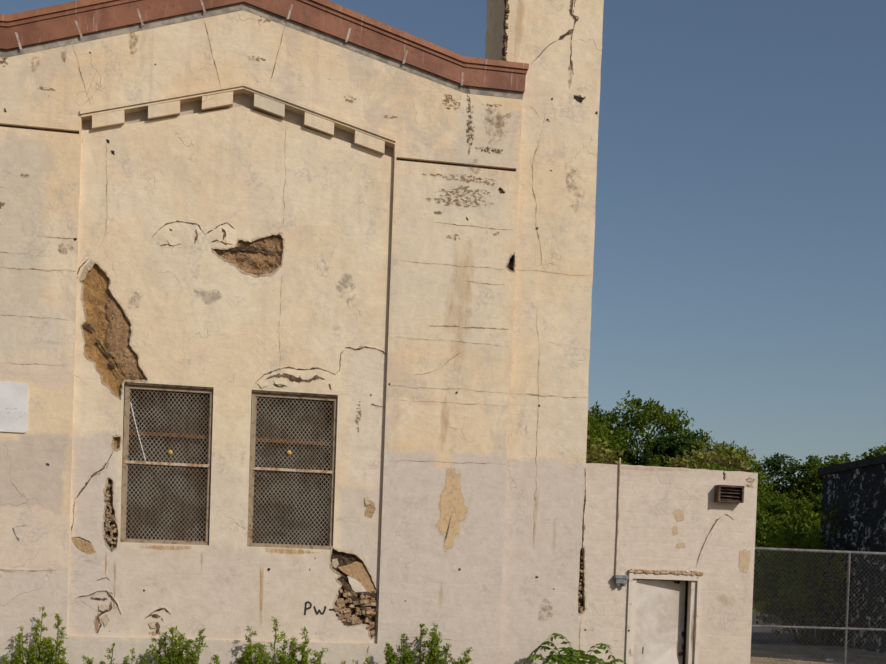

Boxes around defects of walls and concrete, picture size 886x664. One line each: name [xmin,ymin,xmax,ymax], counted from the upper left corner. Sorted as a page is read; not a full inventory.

spalling [502,0,510,61]
crack [532,0,579,75]
peeling [422,174,496,220]
spalling [211,232,285,278]
spalling [77,258,148,400]
flaking render [71,537,96,554]
spalling [102,476,120,552]
crack [696,514,733,567]
spalling [329,546,379,640]
spalling [578,546,587,616]